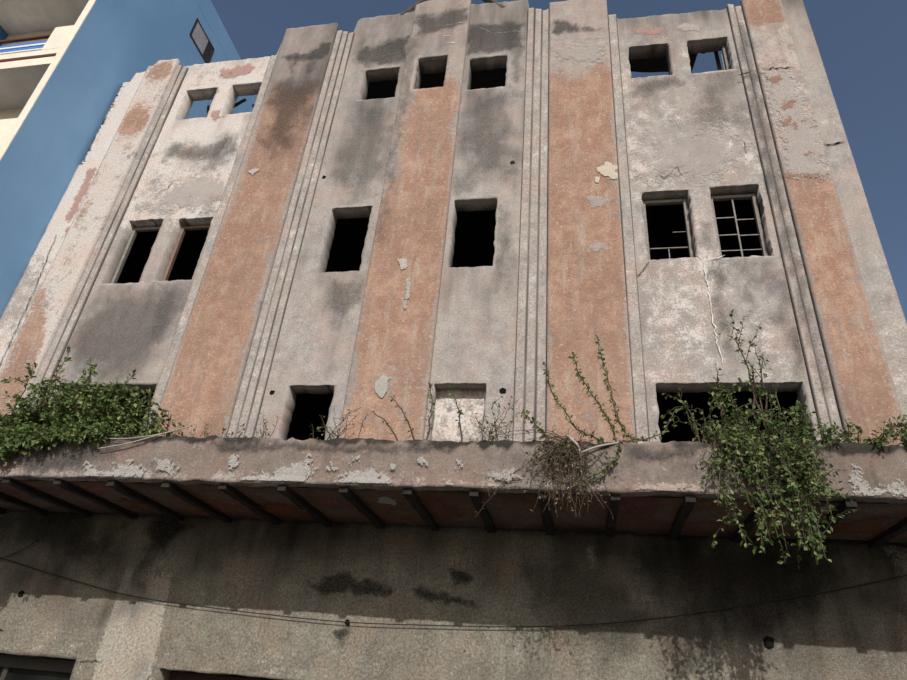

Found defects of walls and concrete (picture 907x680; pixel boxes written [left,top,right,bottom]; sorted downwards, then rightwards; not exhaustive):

damp [553,20,594,34]
damp [169,137,235,166]
peeling [595,161,618,183]
peeling [397,258,411,309]
crack [699,255,724,363]
spalling [374,373,391,398]
peeling [83,458,179,477]
peeling [228,454,241,470]
peeling [241,451,399,483]
peeling [846,464,907,496]
damp [314,574,392,596]